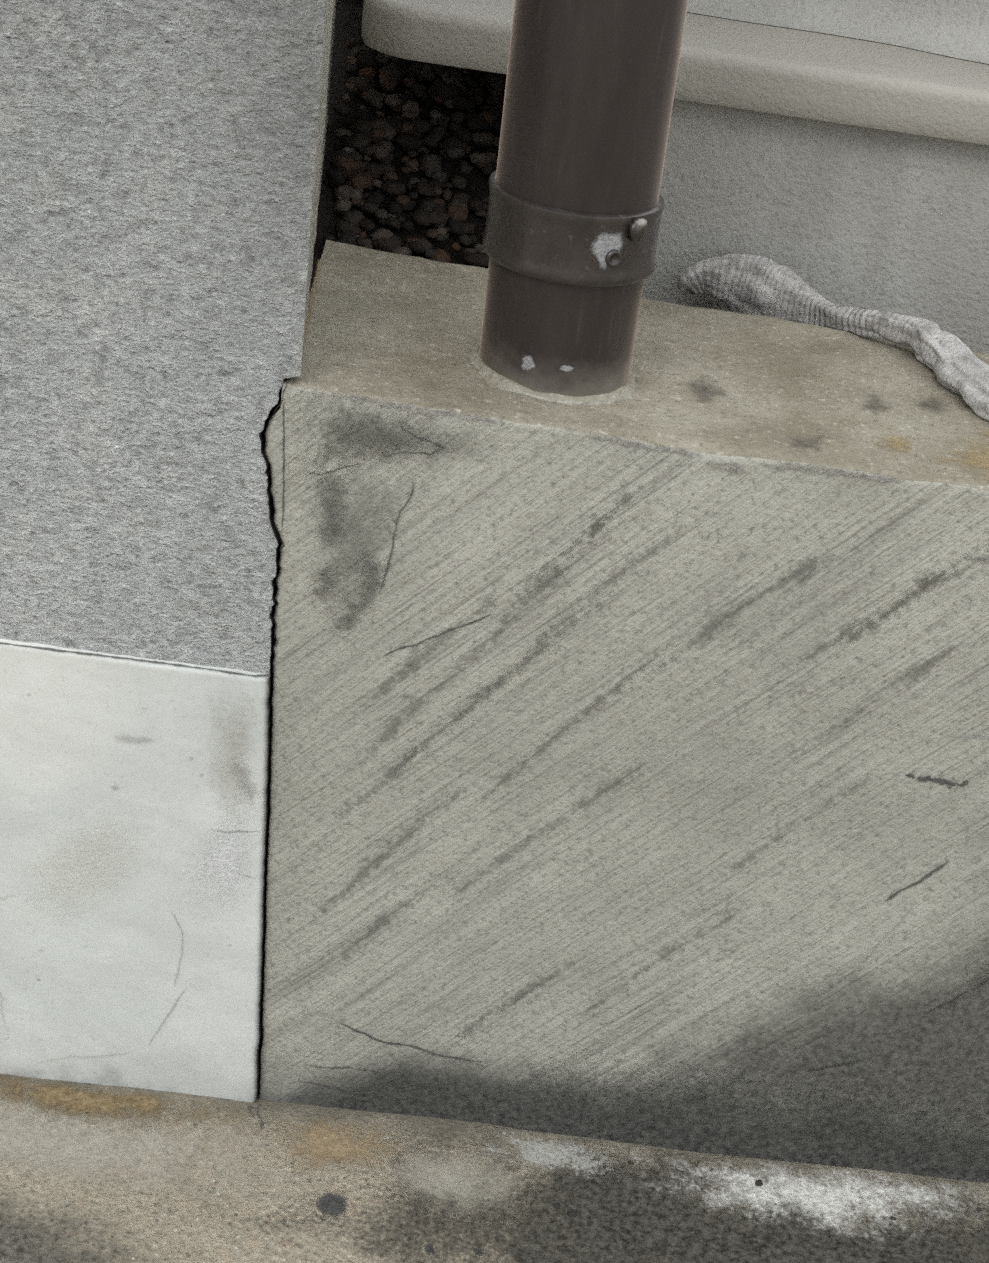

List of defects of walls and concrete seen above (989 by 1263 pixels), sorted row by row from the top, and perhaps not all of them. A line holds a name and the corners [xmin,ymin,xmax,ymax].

crack [0,259,322,1129]
damp [0,1112,172,1178]
damp [322,965,989,1263]